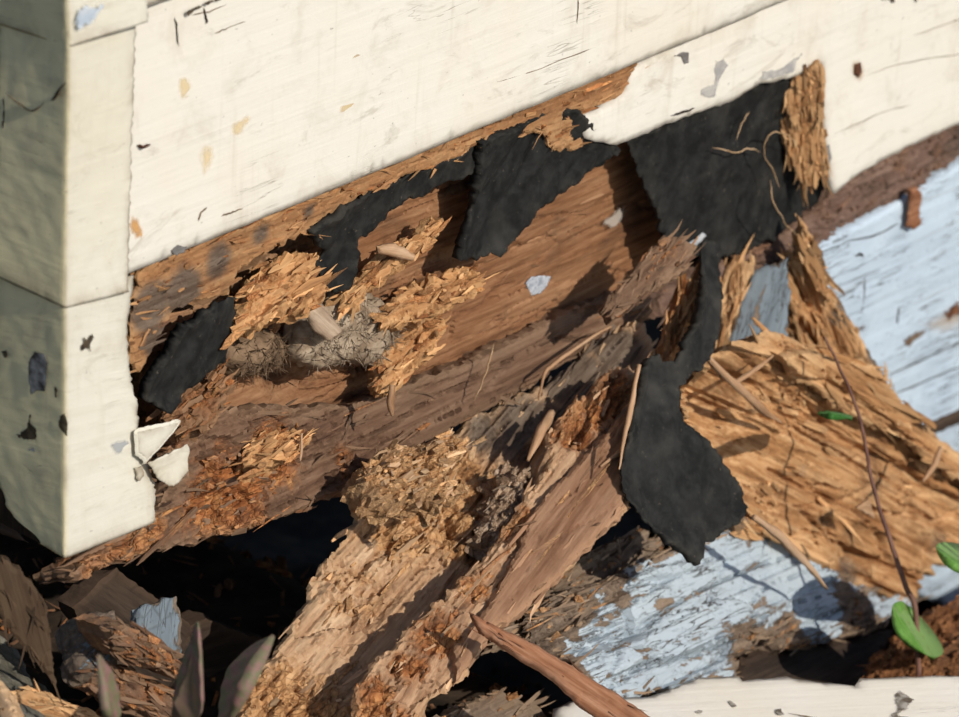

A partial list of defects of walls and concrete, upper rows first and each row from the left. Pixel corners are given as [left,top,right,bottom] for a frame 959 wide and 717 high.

spalling [171,245,187,256]
peeling [905,329,925,346]
peeling [28,352,57,397]
peeling [17,414,36,440]
peeling [58,414,68,436]
peeling [134,419,190,487]
spalling [504,548,675,666]
spalling [708,569,890,678]
spalling [621,676,668,698]
peeling [891,691,914,717]